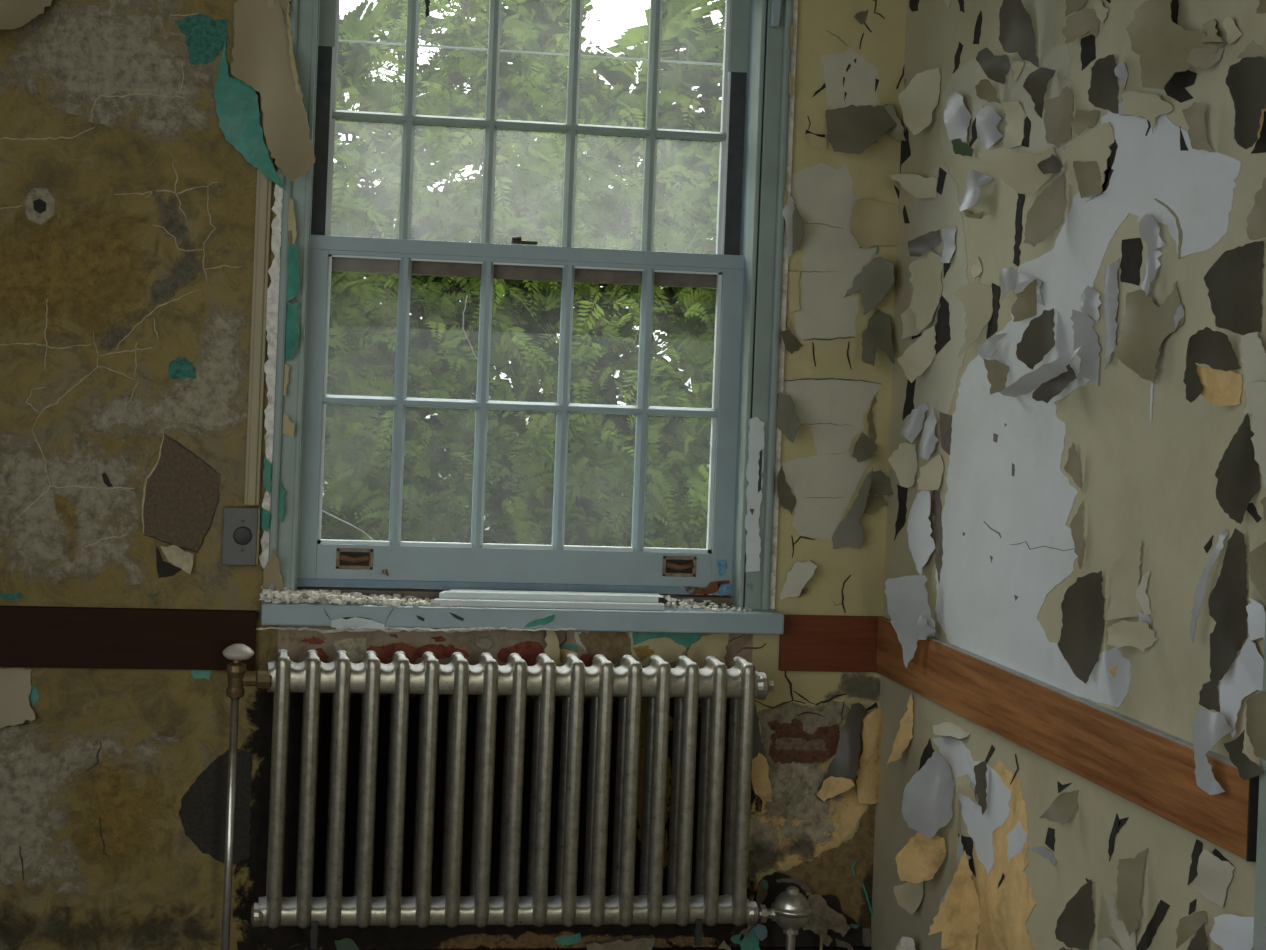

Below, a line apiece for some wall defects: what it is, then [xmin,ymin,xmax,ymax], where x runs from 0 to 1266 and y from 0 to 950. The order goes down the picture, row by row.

peeling [0,0,52,30]
crack [0,63,187,140]
damp [0,0,216,142]
crack [0,163,243,524]
peeling [175,0,315,592]
peeling [745,0,1266,795]
flaking render [102,434,220,578]
peeling [0,668,39,729]
peeling [256,608,766,668]
peeling [440,693,916,950]
peeling [893,722,1079,950]
peeling [1055,813,1266,950]